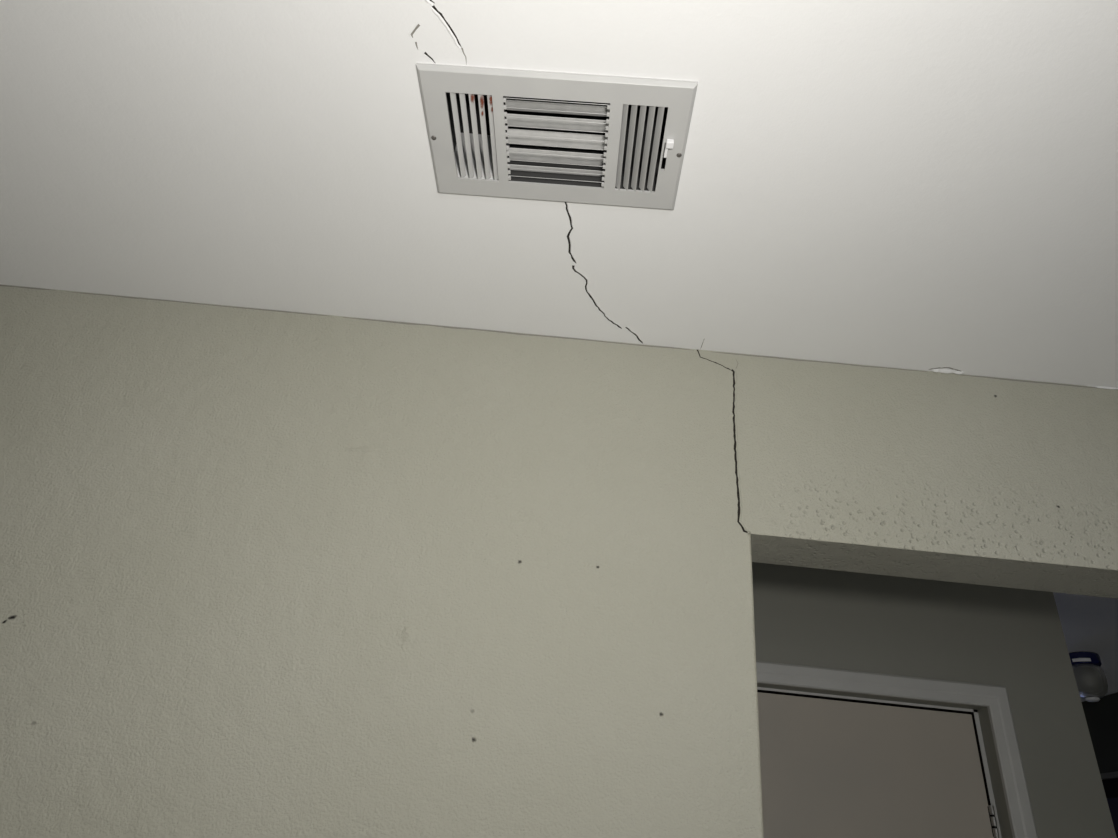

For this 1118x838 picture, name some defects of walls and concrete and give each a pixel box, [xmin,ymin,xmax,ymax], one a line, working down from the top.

crack [408,0,467,65]
crack [0,202,927,533]
crack [962,375,1118,390]